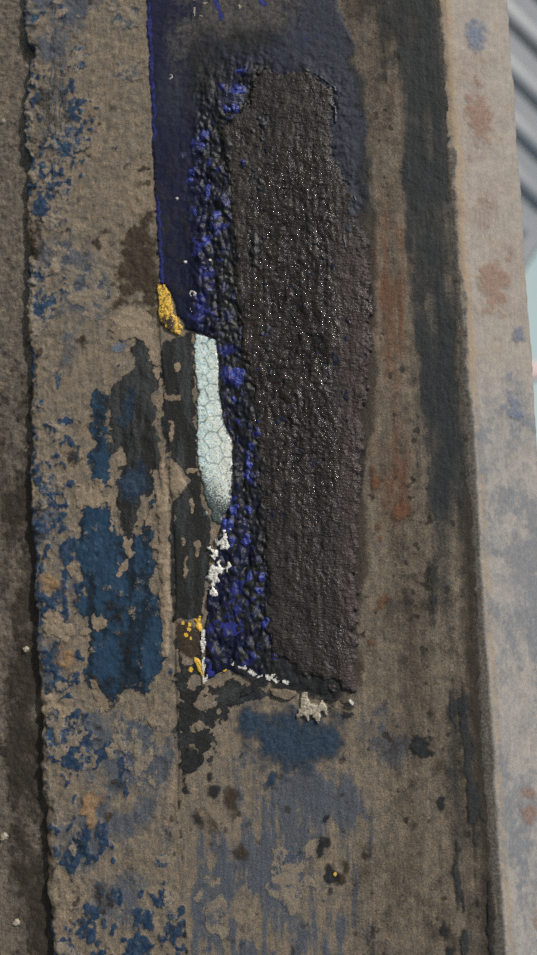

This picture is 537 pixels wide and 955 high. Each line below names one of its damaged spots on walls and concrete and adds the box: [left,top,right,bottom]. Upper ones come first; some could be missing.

peeling [26,122,183,380]
peeling [155,393,181,442]
peeling [39,469,116,532]
peeling [66,561,80,577]
peeling [116,535,135,578]
peeling [43,609,108,642]
peeling [41,675,164,788]
peeling [193,866,230,940]
peeling [265,838,320,916]
peeling [54,941,80,955]